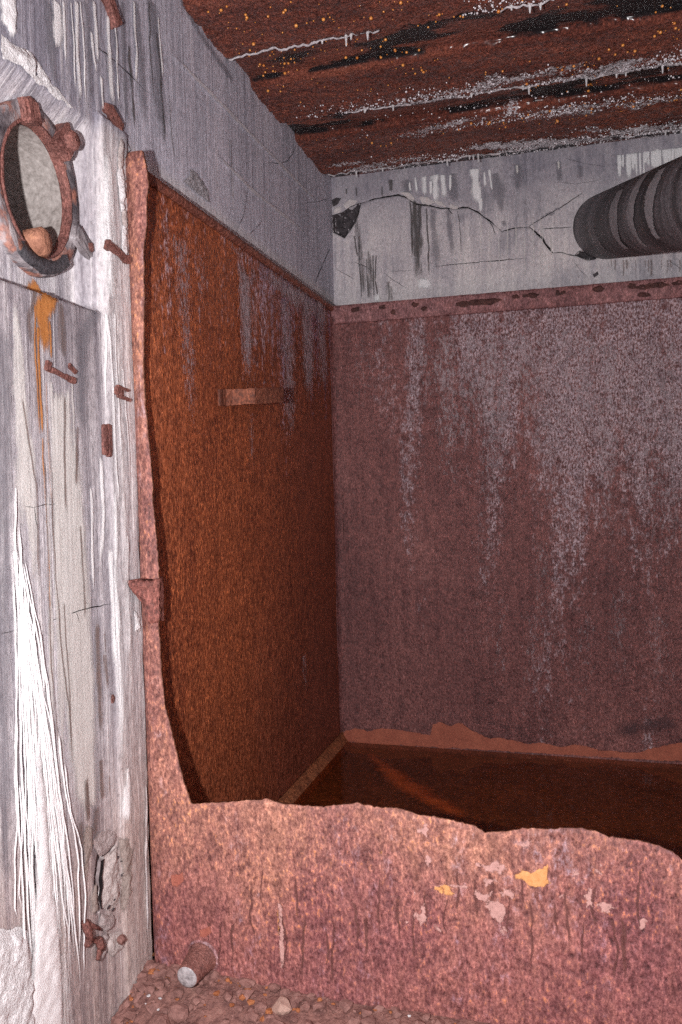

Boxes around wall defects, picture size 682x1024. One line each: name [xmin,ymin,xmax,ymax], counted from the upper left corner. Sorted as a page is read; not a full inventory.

damp [500,0,553,13]
damp [212,30,379,73]
damp [328,56,682,288]
spalling [332,198,361,238]
crack [309,158,605,274]
damp [354,212,390,302]
rust [27,279,57,506]
rust [344,722,682,761]
spalling [81,825,134,963]
peeling [436,861,514,934]
rust [515,865,549,887]
peeling [584,888,613,914]